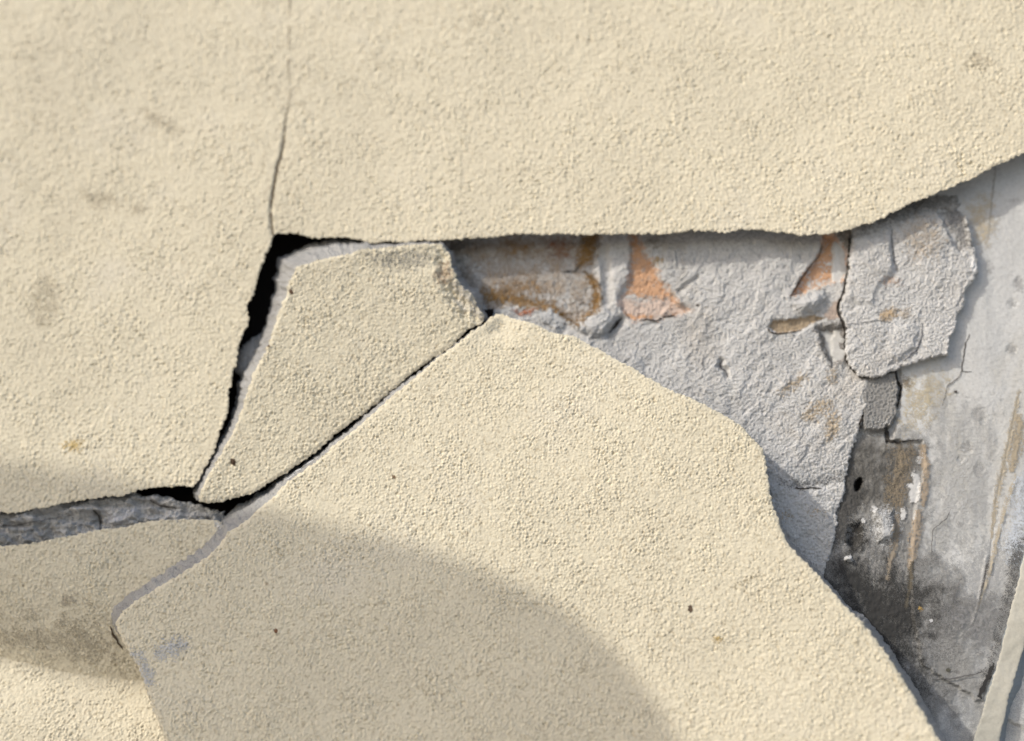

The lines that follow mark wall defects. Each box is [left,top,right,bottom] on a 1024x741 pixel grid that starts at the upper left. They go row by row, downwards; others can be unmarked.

crack [217,0,392,442]
flaking render [616,234,695,324]
flaking render [789,233,849,297]
crack [412,309,494,374]
crack [2,498,101,530]
crack [136,406,372,516]
spalling [111,318,489,636]
spalling [763,450,947,741]
water stain [776,360,1024,741]